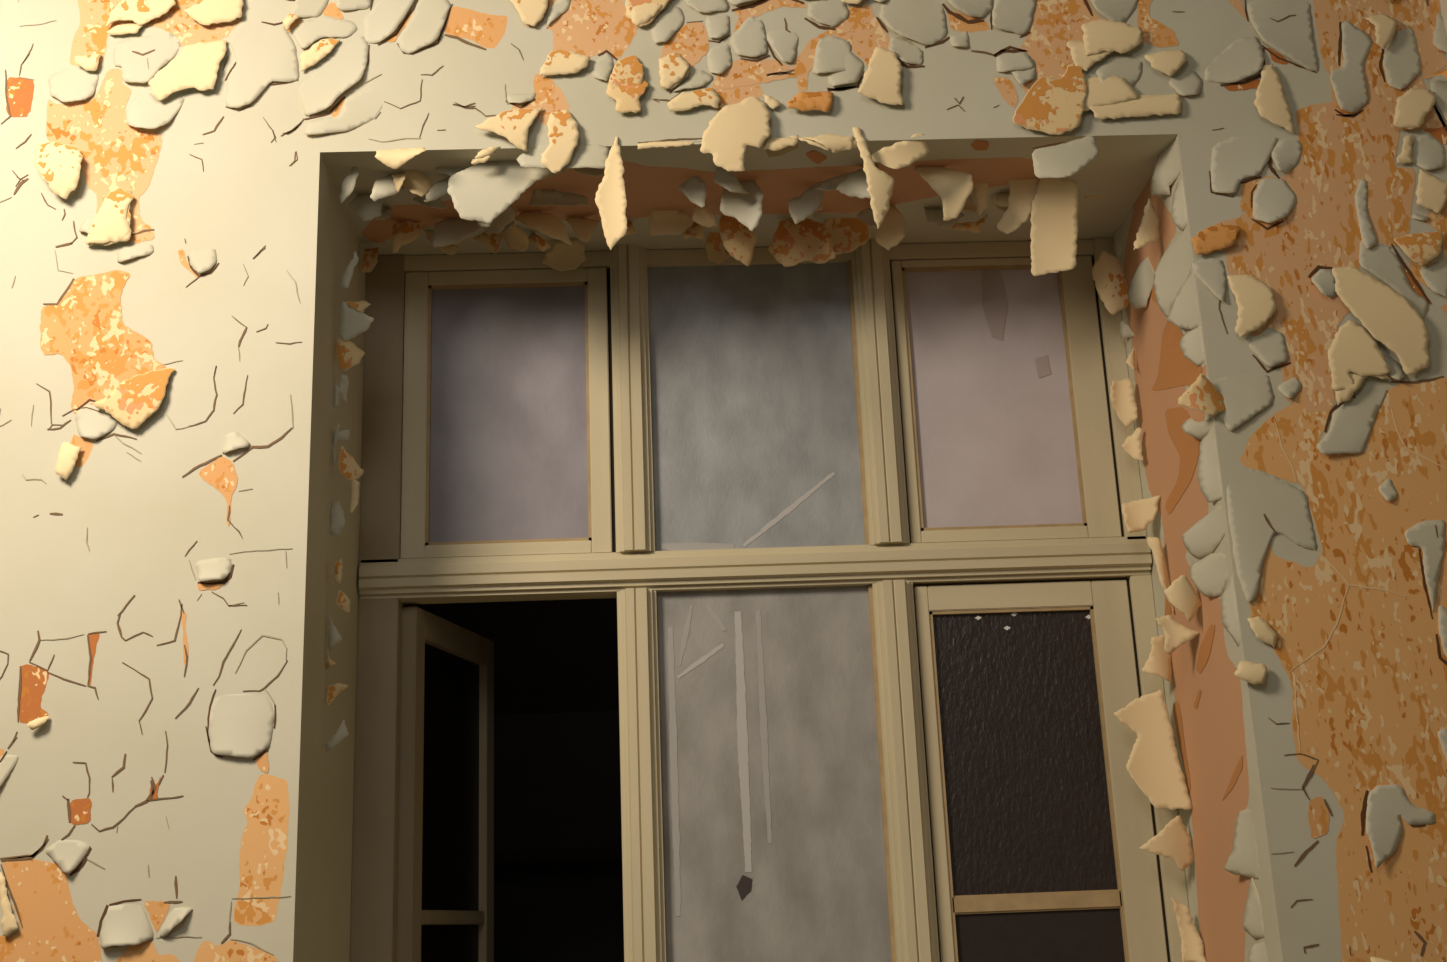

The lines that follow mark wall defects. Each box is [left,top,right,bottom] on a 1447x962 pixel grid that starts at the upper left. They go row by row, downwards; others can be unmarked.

crack [0,1,78,305]
crack [132,49,155,69]
crack [131,229,300,429]
peeling [6,0,507,467]
peeling [199,432,250,526]
peeling [330,0,1447,962]
peeling [19,664,49,723]
crack [0,383,293,927]
peeling [326,558,350,706]
peeling [0,694,289,962]
crack [97,864,289,955]